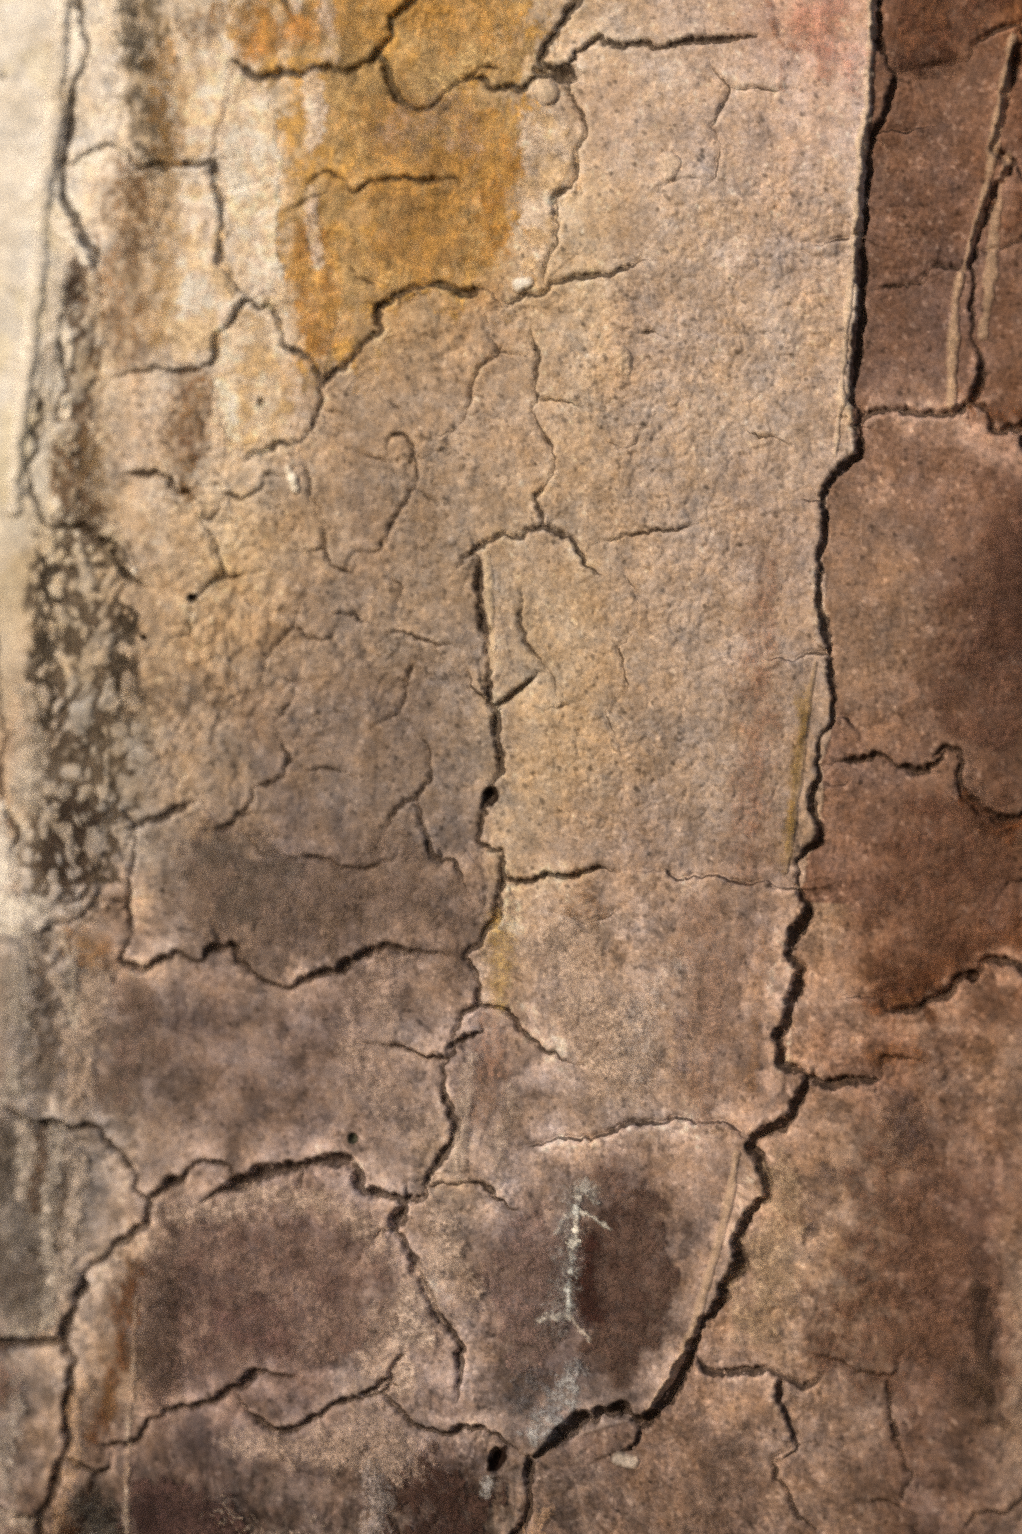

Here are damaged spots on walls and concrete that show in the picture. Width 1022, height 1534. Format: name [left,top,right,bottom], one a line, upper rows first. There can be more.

rust [227,0,552,392]
crack [60,0,757,643]
water stain [0,255,223,1337]
crack [0,290,609,1534]
water stain [177,810,499,1127]
water stain [0,1166,679,1534]
water stain [449,1053,477,1177]
crack [511,0,1022,1534]
water stain [870,497,1022,981]